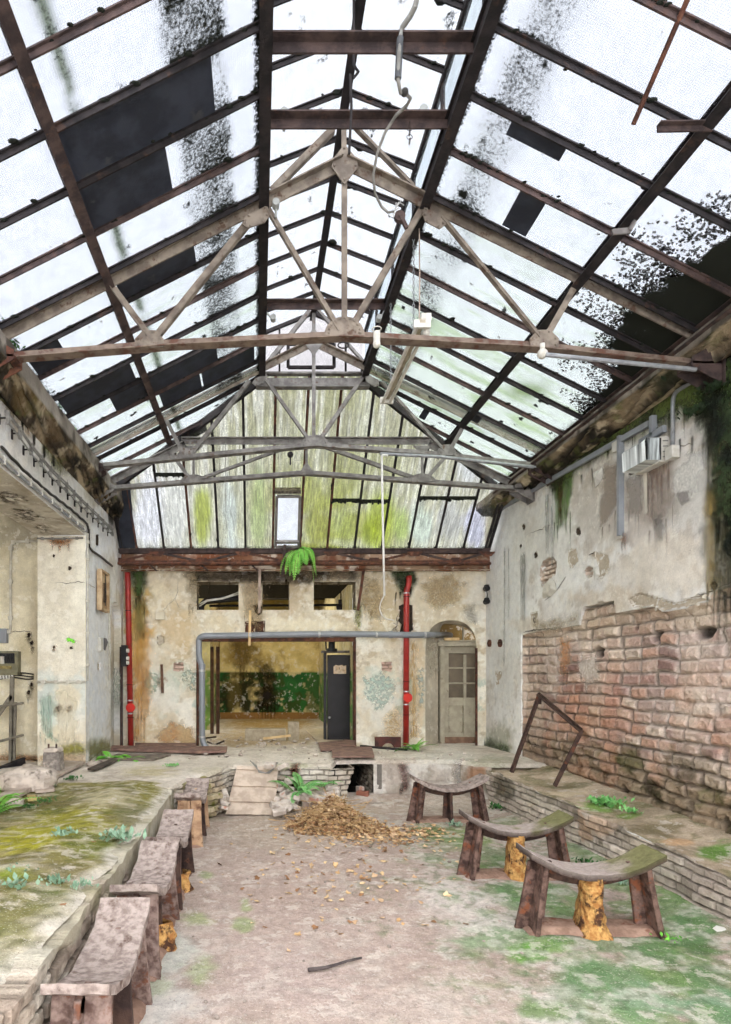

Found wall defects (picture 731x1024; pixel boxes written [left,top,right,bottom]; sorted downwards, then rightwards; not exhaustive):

flaking render [539,548,609,587]
water stain [581,424,731,615]
flaking render [522,582,731,835]